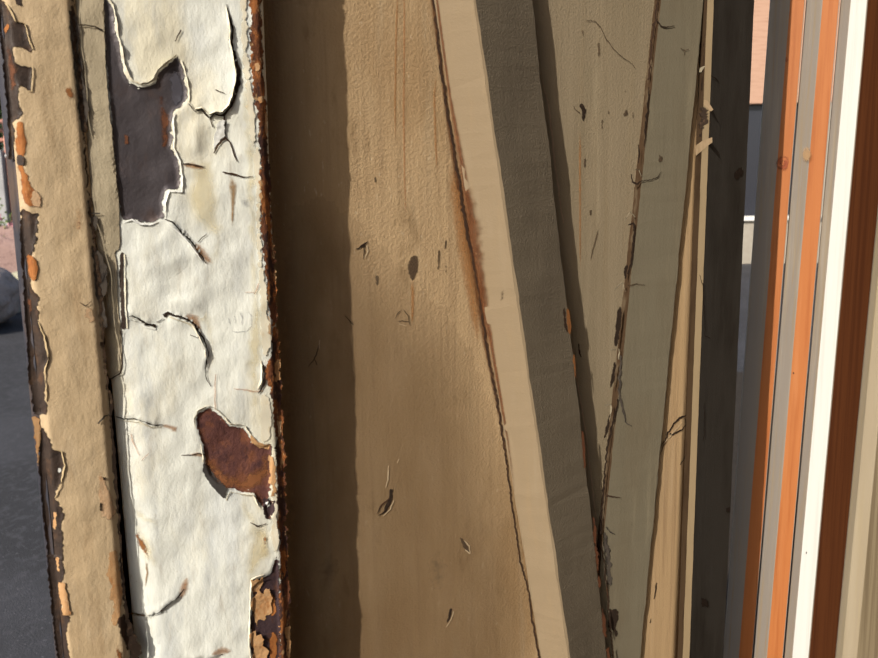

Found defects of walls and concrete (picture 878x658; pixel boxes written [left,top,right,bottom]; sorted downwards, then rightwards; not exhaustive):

peeling [0,0,33,160]
peeling [104,0,190,225]
crack [183,4,241,168]
crack [586,0,673,185]
peeling [19,209,71,658]
crack [69,0,211,658]
rust [194,0,291,658]
peeling [252,147,272,442]
crack [432,0,540,658]
crack [624,211,644,286]
crack [660,403,705,455]
peeling [248,450,282,658]